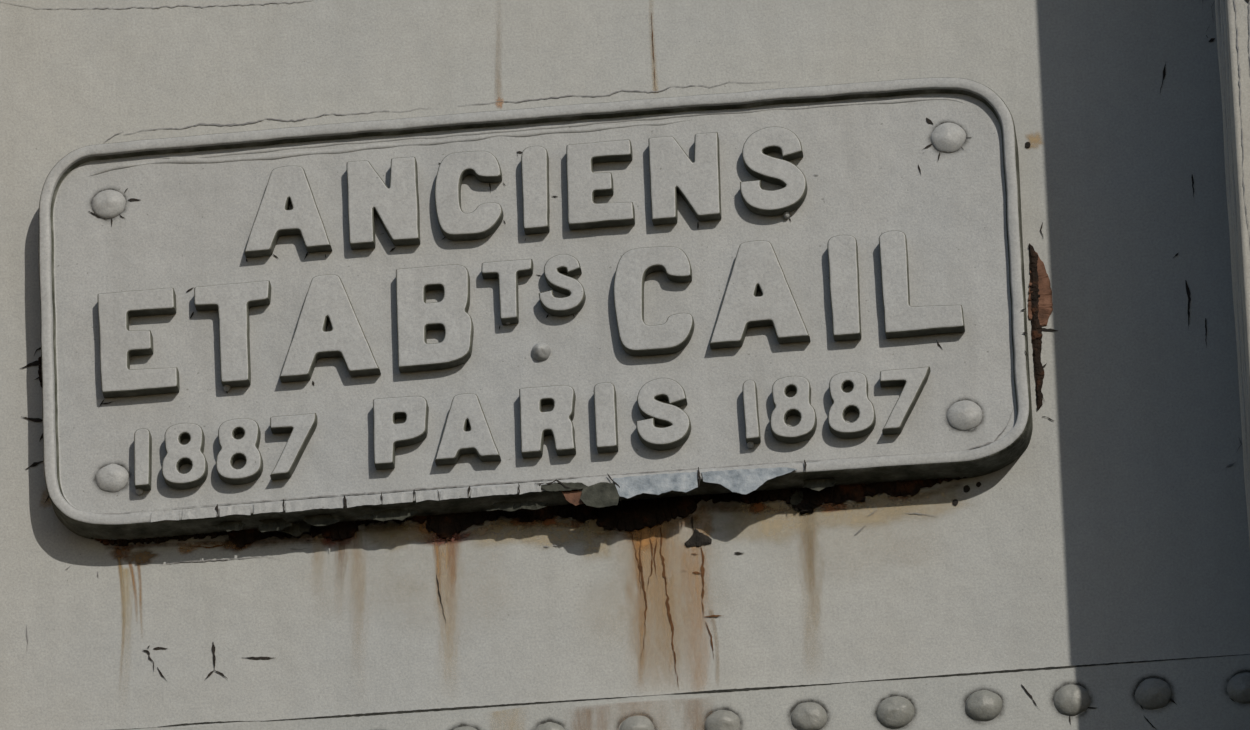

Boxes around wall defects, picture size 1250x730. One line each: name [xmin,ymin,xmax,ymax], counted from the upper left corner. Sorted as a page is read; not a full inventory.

peeling [91,467,981,548]
rust [114,546,157,617]
rust [391,491,945,687]